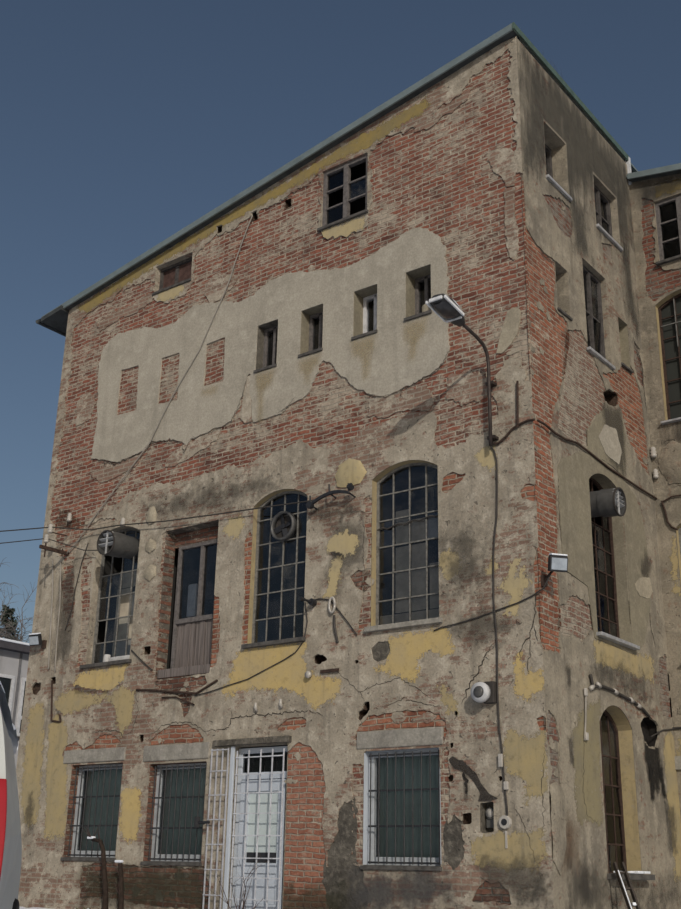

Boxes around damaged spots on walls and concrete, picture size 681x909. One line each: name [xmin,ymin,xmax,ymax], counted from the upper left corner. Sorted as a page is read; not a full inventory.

leakage [525,62,638,329]
flaking render [50,49,649,652]
peeling [20,554,137,841]
peeling [117,784,143,845]
flaking render [140,675,207,746]
crack [95,692,321,739]
peeling [221,513,342,711]
flaking render [283,742,368,909]
peeling [372,626,456,683]
crack [519,594,538,674]
peeling [499,711,559,817]
peeling [571,699,603,829]